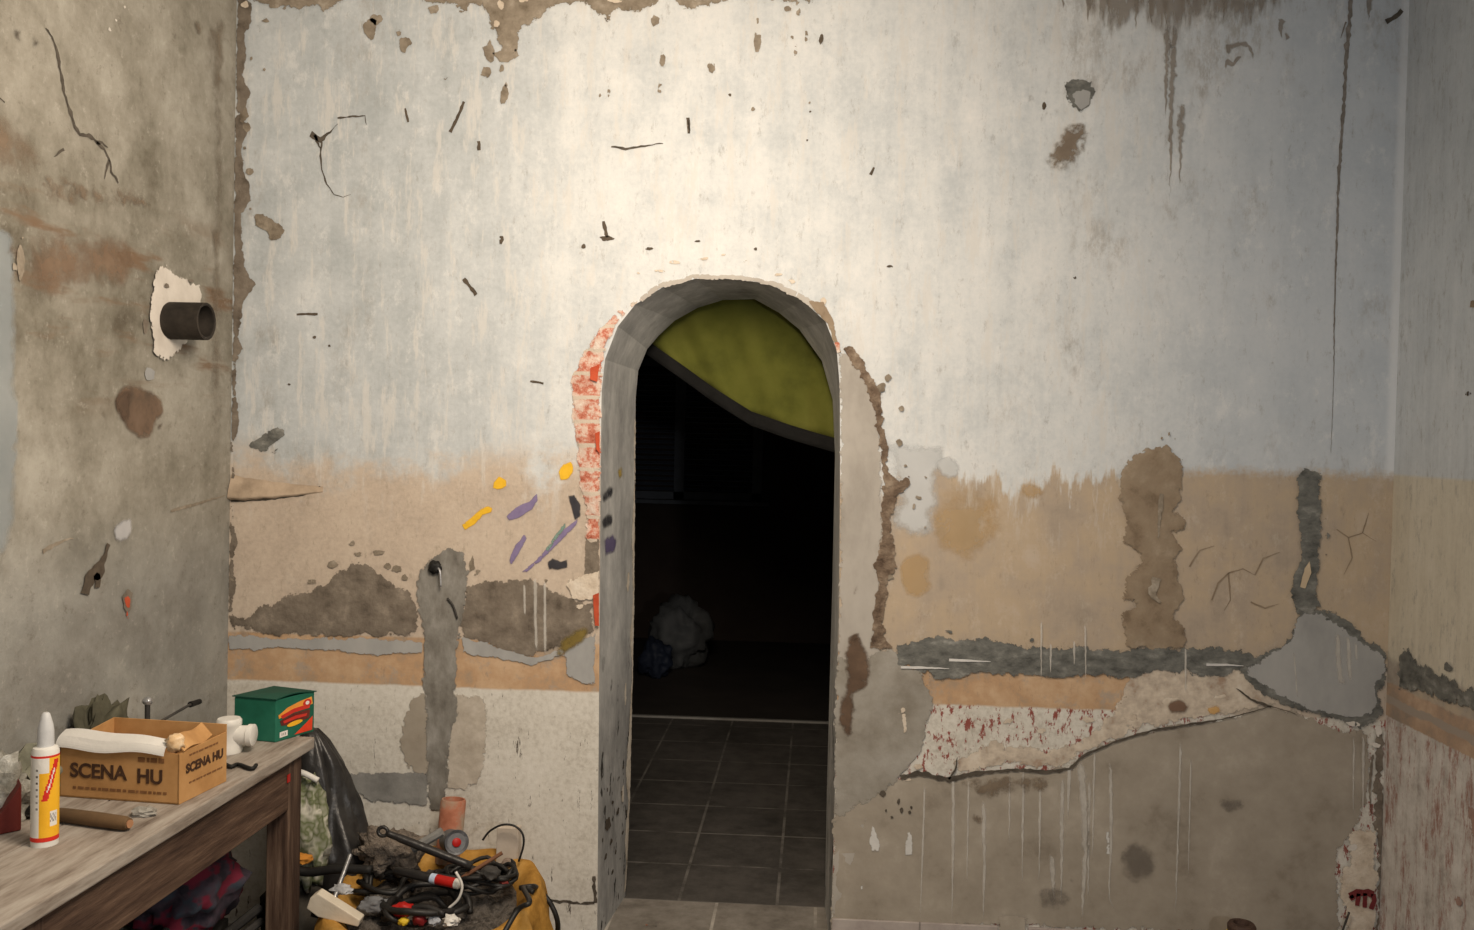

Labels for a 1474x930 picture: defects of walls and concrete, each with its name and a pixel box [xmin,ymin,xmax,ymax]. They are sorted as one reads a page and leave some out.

crack [46,28,119,183]
flaking render [425,0,660,104]
flaking render [676,0,726,9]
water stain [1050,124,1084,165]
water stain [1086,0,1289,182]
flaking render [231,0,341,479]
flaking render [581,221,615,249]
flaking render [116,386,163,437]
flaking render [570,240,927,650]
flaking render [228,506,419,637]
flaking render [460,556,600,656]
flaking render [830,667,1382,930]